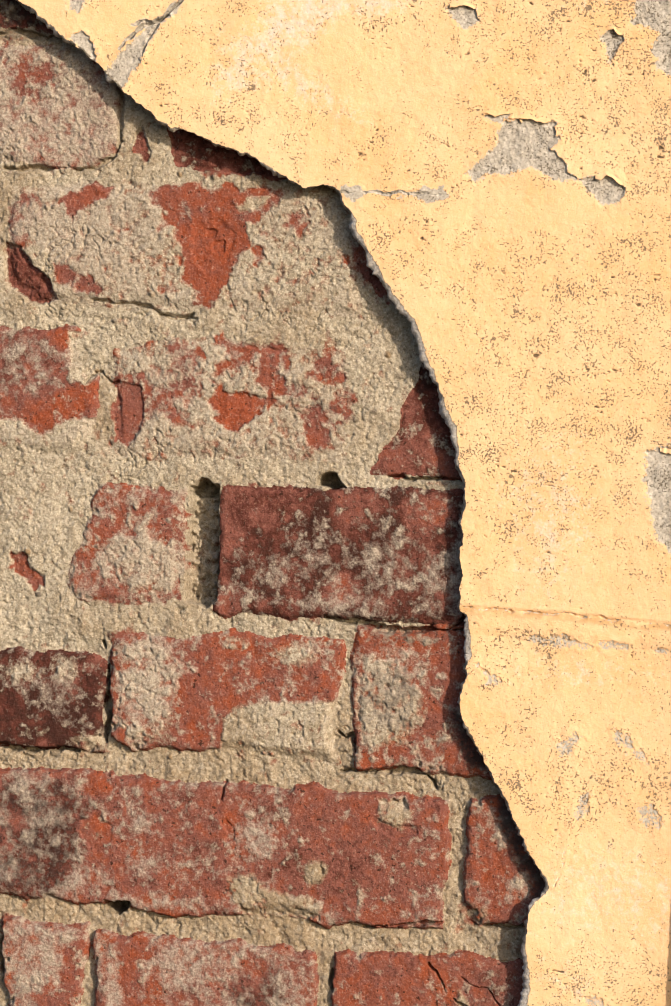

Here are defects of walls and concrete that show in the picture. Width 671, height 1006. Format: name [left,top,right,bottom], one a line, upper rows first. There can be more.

crack [118,0,184,56]
peeling [600,25,624,62]
peeling [630,0,671,77]
peeling [468,109,626,205]
spalling [4,242,58,304]
spalling [16,0,549,1006]
peeling [642,444,671,554]
spalling [9,551,45,591]
crack [426,961,501,1006]